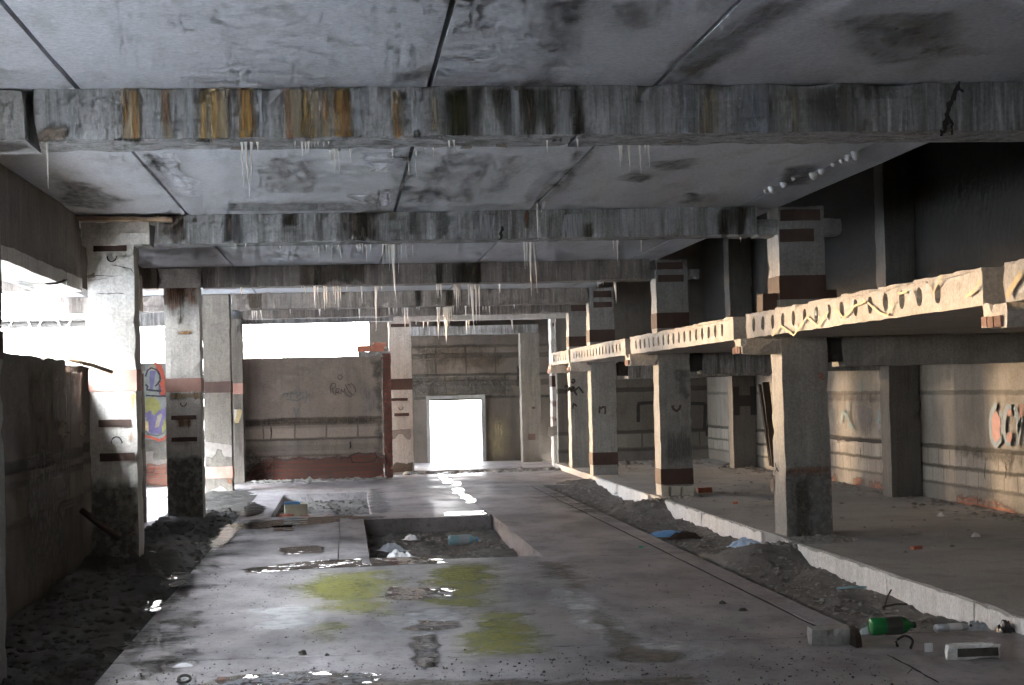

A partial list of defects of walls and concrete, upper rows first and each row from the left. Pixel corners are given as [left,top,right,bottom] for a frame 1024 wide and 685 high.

rust [121,89,140,139]
rust [161,92,172,138]
rust [199,88,253,139]
rust [284,89,352,139]
damp [444,80,580,137]
crack [940,81,964,136]
damp [300,264,364,285]
damp [436,263,480,306]